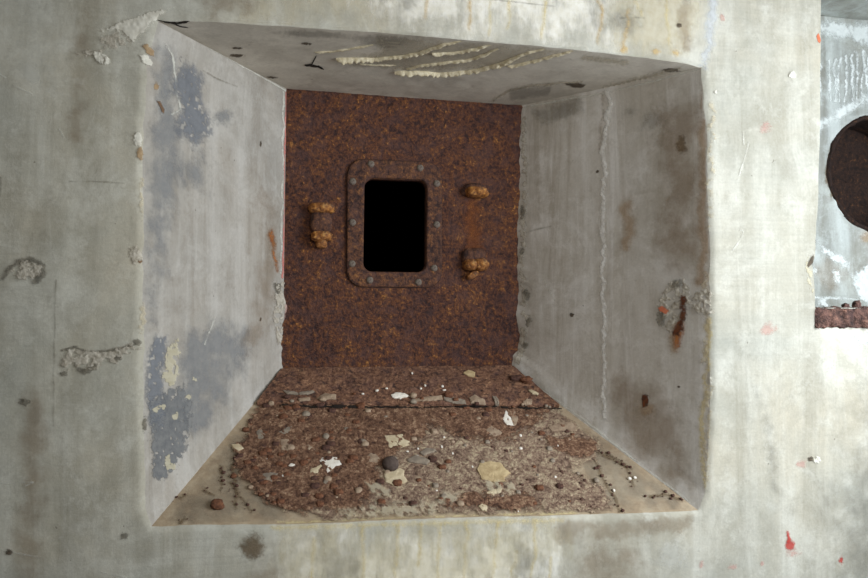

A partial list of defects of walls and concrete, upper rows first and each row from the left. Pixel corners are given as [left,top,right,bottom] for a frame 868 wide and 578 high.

peeling [134,132,143,160]
water stain [153,64,229,207]
spalling [2,257,45,284]
corrosion [831,300,867,308]
peeling [60,331,244,480]
crack [279,402,562,410]